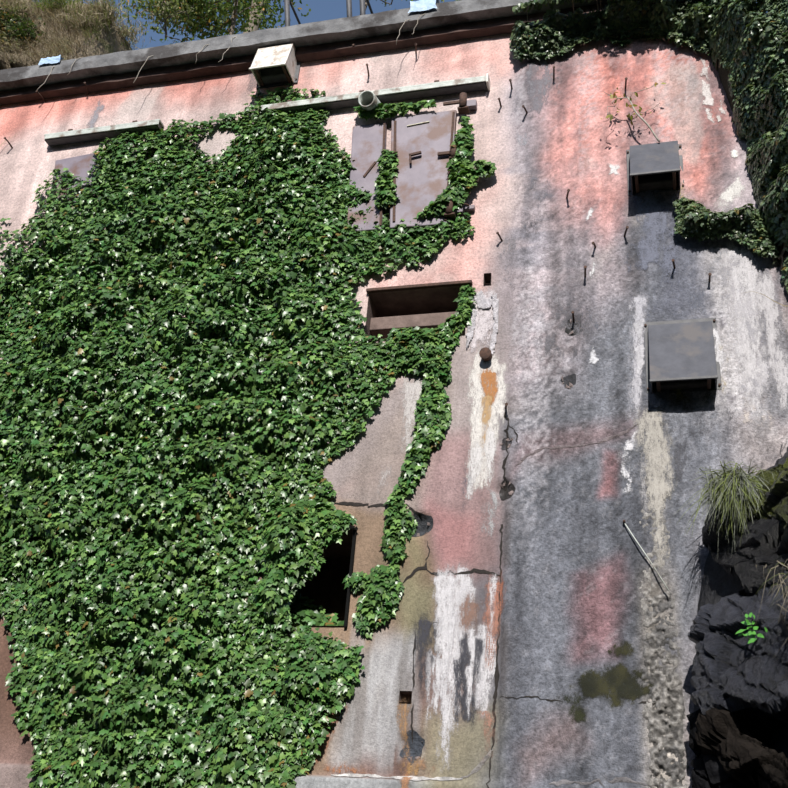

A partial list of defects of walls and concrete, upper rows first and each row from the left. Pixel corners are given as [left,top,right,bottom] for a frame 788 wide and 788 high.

peeling [465,291,499,355]
corrosion [479,369,498,444]
crack [502,411,518,498]
spalling [411,512,433,537]
damp [332,567,497,781]
corrosion [459,575,504,670]
crack [403,524,561,788]